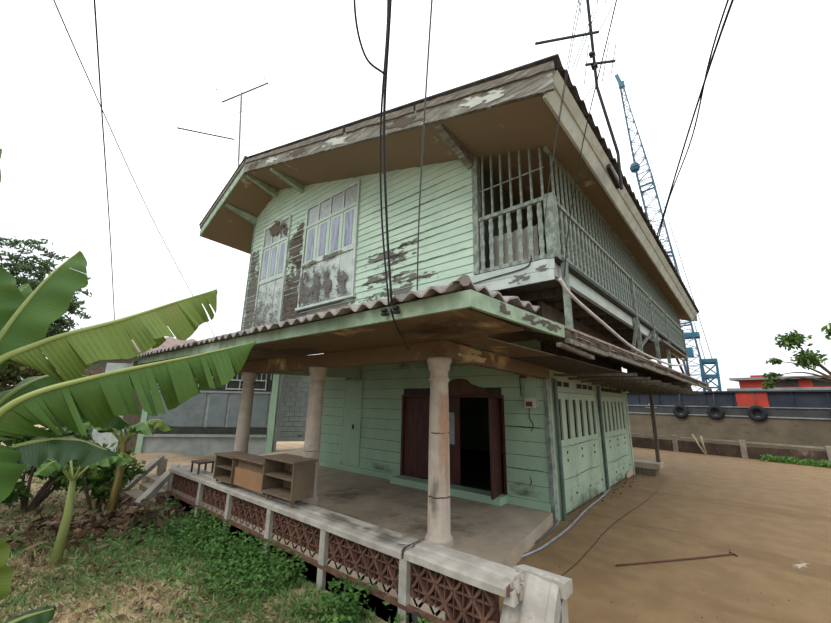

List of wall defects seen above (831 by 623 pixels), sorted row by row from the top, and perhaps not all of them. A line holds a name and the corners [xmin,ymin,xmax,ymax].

peeling [458,89,504,110]
peeling [322,136,347,147]
peeling [247,148,306,169]
peeling [243,219,440,330]